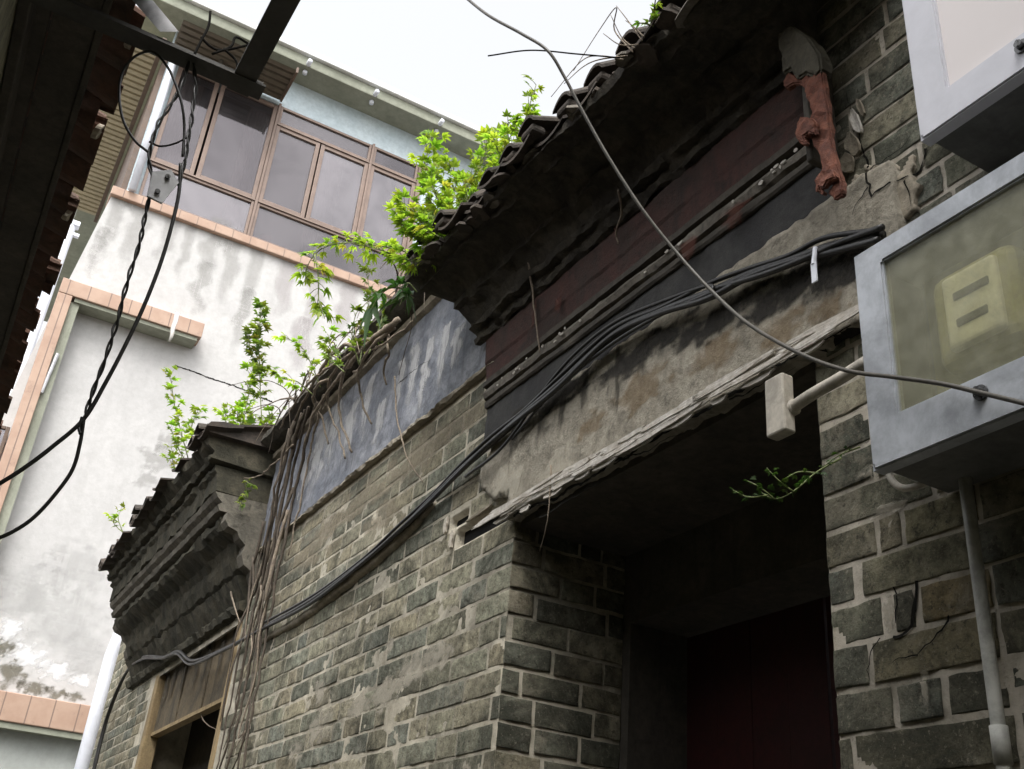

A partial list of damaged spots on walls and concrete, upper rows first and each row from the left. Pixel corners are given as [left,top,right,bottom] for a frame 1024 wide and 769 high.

crack [852,133,927,215]
damp [510,247,869,447]
peeling [443,305,859,549]
damp [0,638,81,701]
crack [867,615,949,679]